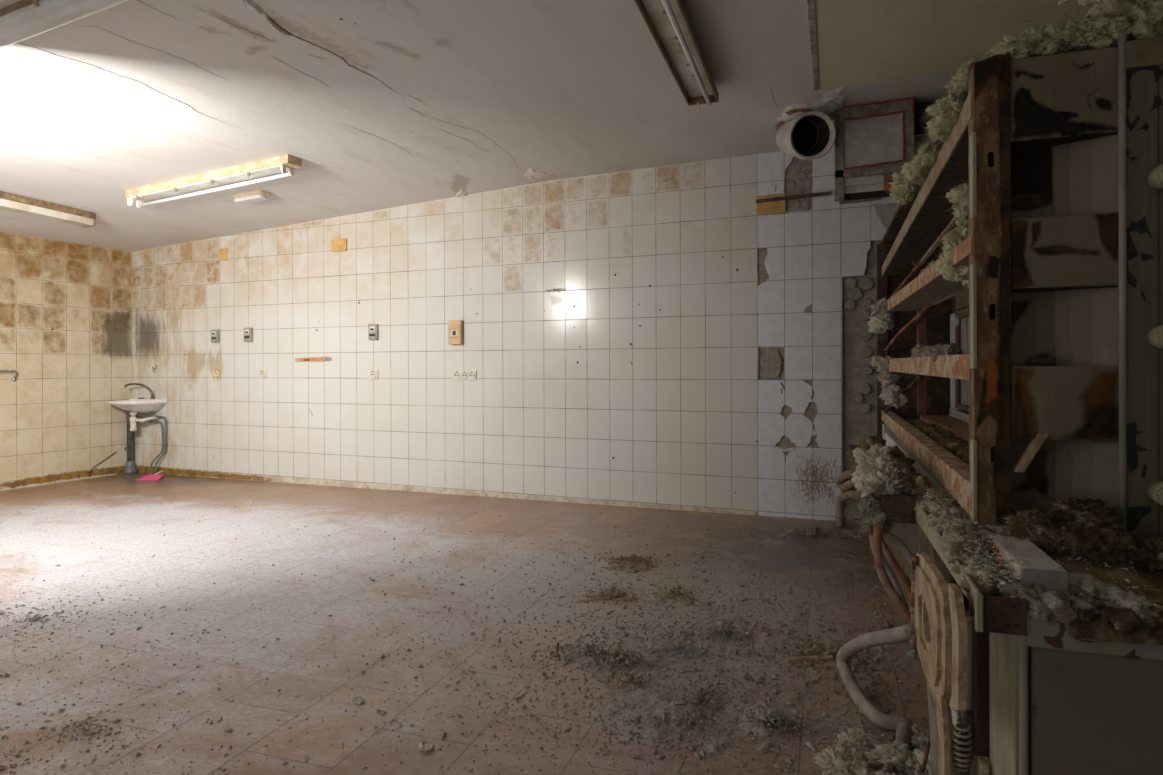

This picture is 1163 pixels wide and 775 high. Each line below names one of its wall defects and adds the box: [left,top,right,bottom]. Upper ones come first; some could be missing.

crack [137,0,517,166]
spalling [757,247,769,286]
leakage [0,303,14,326]
spalling [758,347,784,379]
spalling [775,402,820,456]